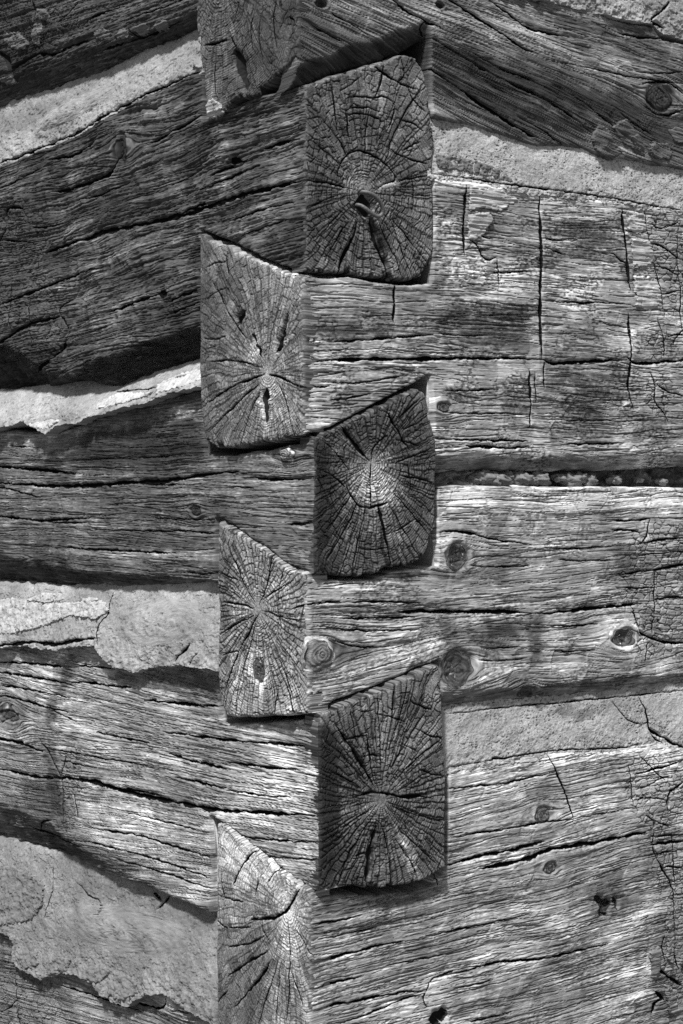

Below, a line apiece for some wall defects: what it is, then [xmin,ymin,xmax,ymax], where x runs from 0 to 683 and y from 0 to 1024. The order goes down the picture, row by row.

crack [0,0,683,720]
crack [0,679,683,1024]